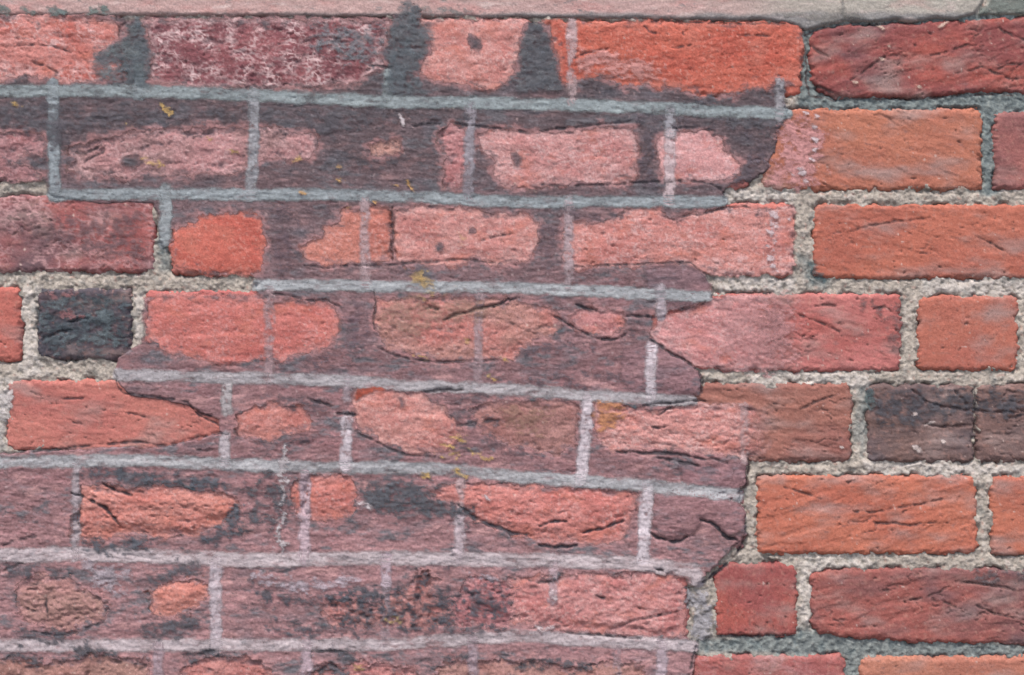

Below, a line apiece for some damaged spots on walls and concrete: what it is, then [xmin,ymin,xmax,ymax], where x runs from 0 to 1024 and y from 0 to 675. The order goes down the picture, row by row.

spalling [0,13,129,85]
spalling [140,16,390,90]
spalling [419,17,528,90]
spalling [542,18,804,98]
spalling [436,122,640,189]
spalling [168,211,267,277]
spalling [300,204,539,269]
spalling [562,205,797,278]
spalling [469,399,763,459]
spalling [68,483,241,545]
spalling [426,482,638,545]
spalling [318,568,688,640]